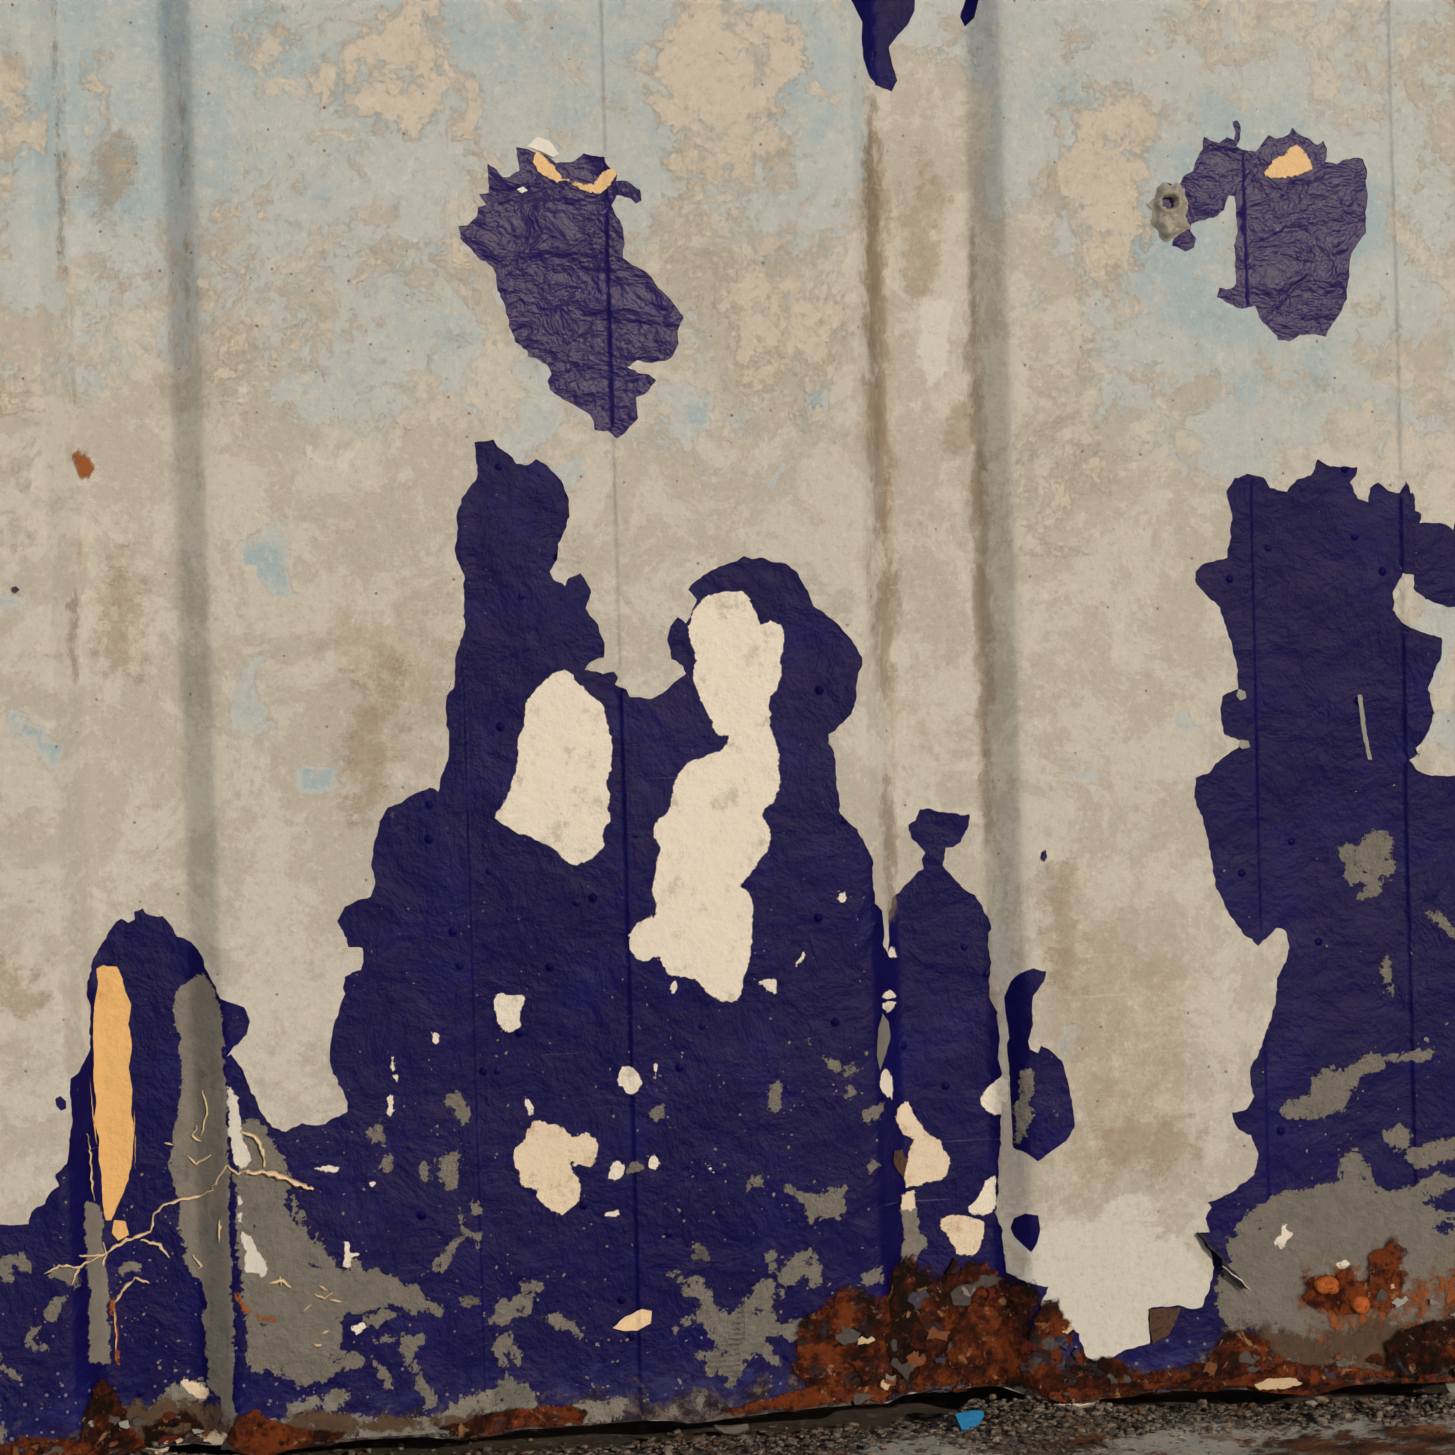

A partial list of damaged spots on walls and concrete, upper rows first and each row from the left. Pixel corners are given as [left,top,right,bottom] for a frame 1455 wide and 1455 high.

peeling [851,0,915,92]
peeling [960,0,978,26]
corrosion [72,451,95,479]
peeling [0,440,1075,1455]
peeling [1114,459,1455,1393]
crack [44,1165,249,1351]
corrosion [110,1298,120,1365]
corrosion [234,1293,276,1322]
peeling [1060,1329,1093,1361]
corrosion [723,1237,1455,1418]
corrosion [0,1378,587,1455]